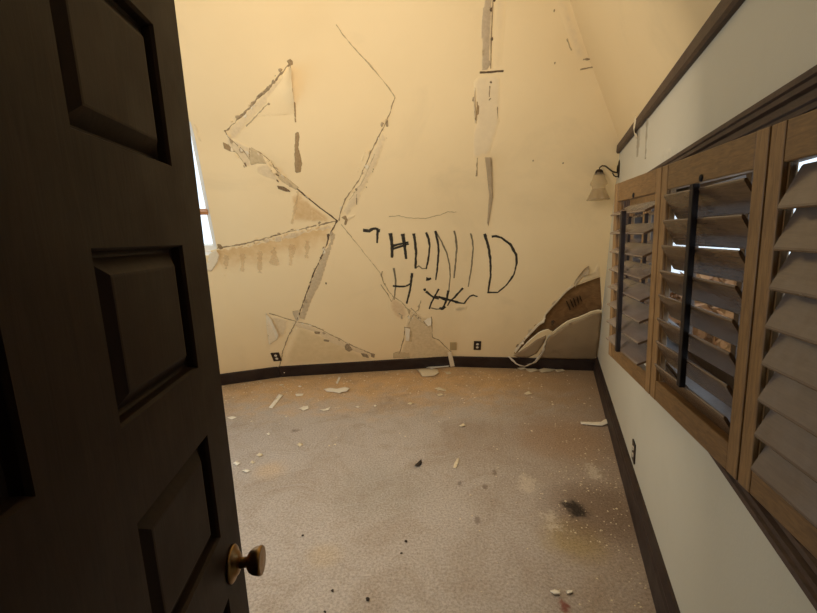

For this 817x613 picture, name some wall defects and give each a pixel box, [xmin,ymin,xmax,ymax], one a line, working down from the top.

peeling [294,132,302,173]
crack [217,25,409,367]
peeling [472,74,500,176]
spalling [393,301,455,374]
spalling [507,263,602,372]